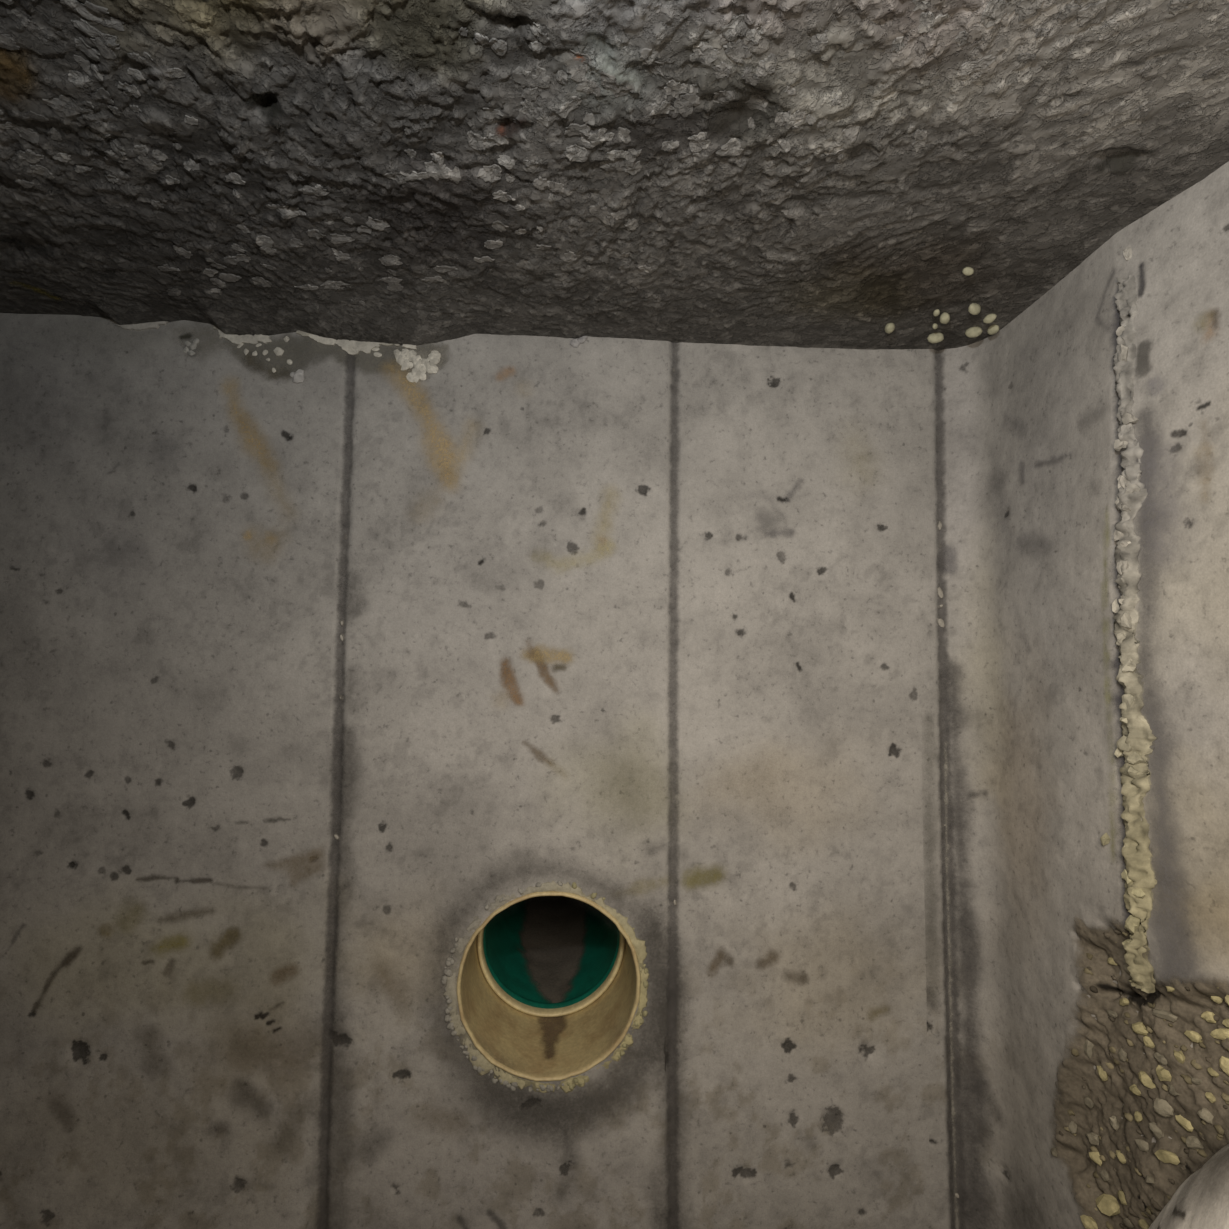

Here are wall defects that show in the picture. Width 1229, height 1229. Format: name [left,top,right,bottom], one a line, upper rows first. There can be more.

rust [502,661,522,704]
rust [526,650,570,687]
spalling [1051,918,1229,1229]